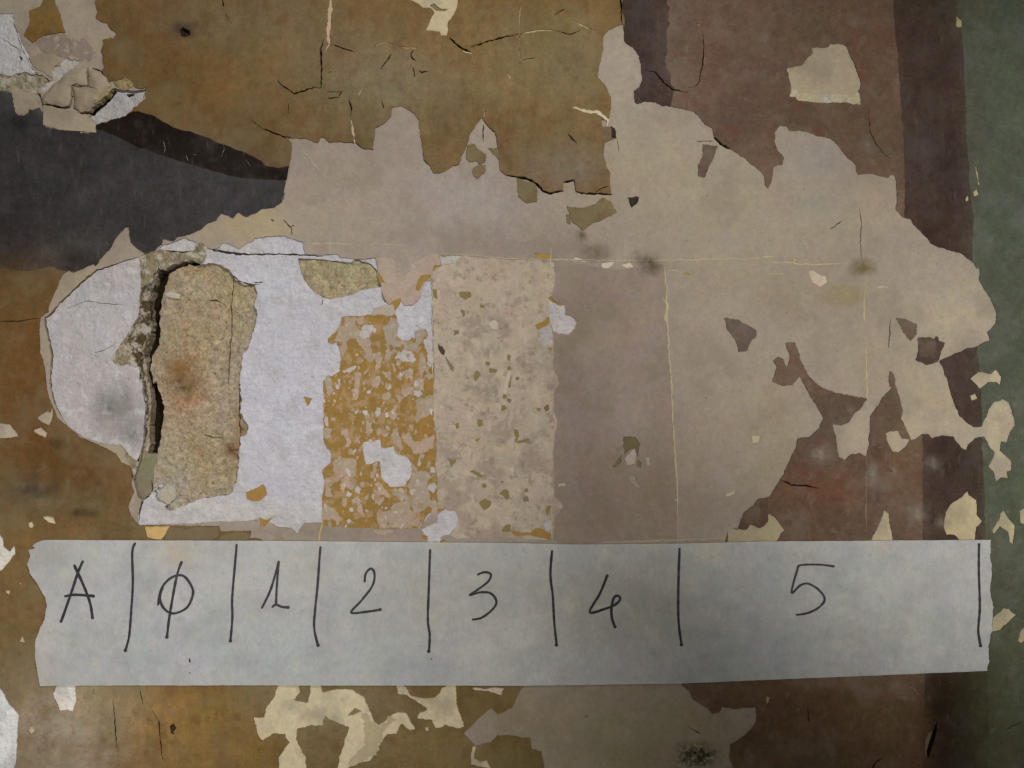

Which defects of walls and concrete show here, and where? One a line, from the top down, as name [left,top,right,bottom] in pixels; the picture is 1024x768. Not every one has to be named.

flaking render [0,0,147,133]
crack [321,0,333,70]
crack [349,103,357,147]
crack [509,176,607,195]
peeling [34,25,1015,544]
crack [135,219,320,499]
peeling [254,683,770,768]